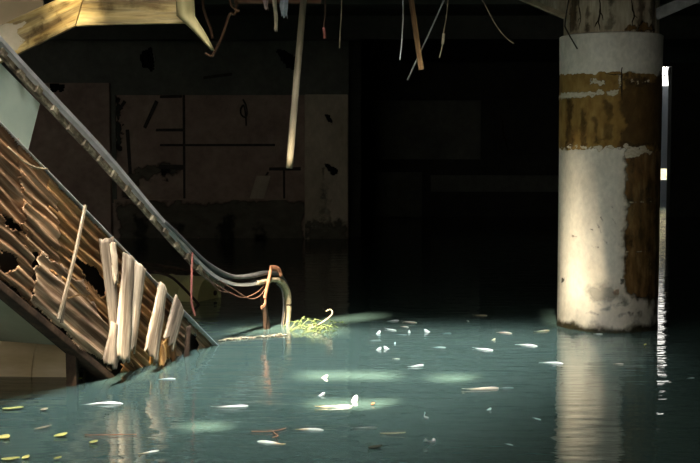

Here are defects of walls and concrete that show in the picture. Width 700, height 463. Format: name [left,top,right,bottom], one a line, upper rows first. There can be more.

crack [578,0,603,30]
peeling [559,71,661,158]